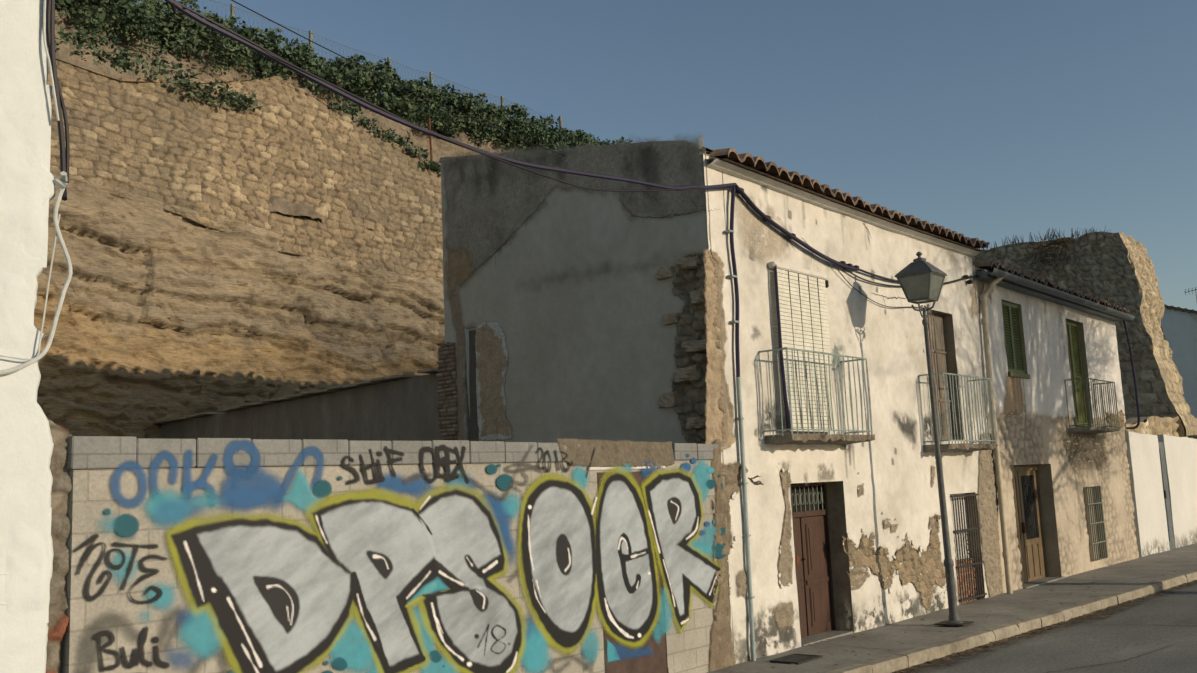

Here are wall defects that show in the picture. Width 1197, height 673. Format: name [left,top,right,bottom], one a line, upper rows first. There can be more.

flaking render [436,342,458,440]
flaking render [475,322,512,441]
spalling [654,250,748,650]
water stain [895,415,945,442]
flaking render [774,463,834,629]
flaking render [842,512,946,610]